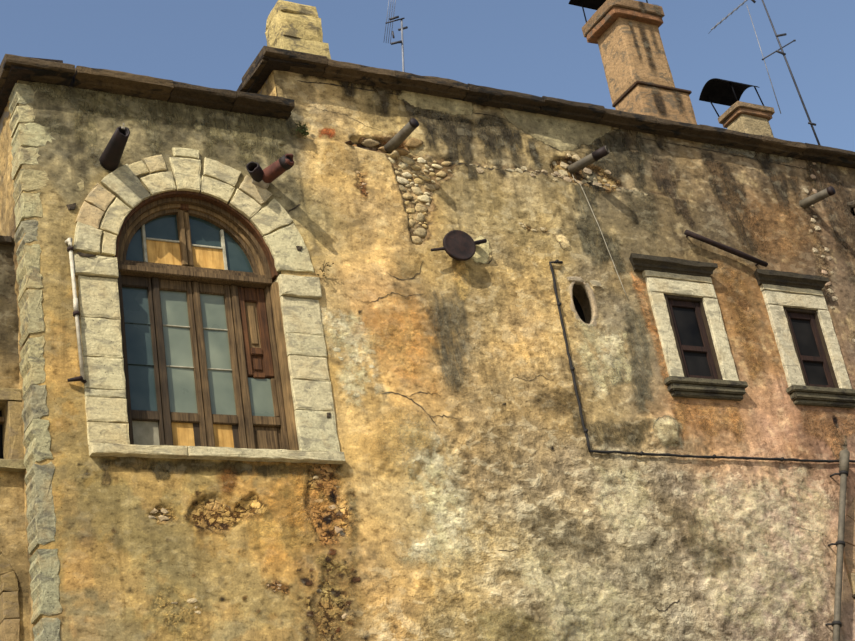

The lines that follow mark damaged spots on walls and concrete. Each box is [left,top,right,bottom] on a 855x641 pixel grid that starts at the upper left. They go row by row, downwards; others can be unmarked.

damp [302,74,541,179]
flaking render [457,153,654,196]
crack [362,292,421,303]
damp [429,295,467,386]
crack [380,391,457,426]
flaking render [148,485,266,533]
flaking render [266,464,361,641]